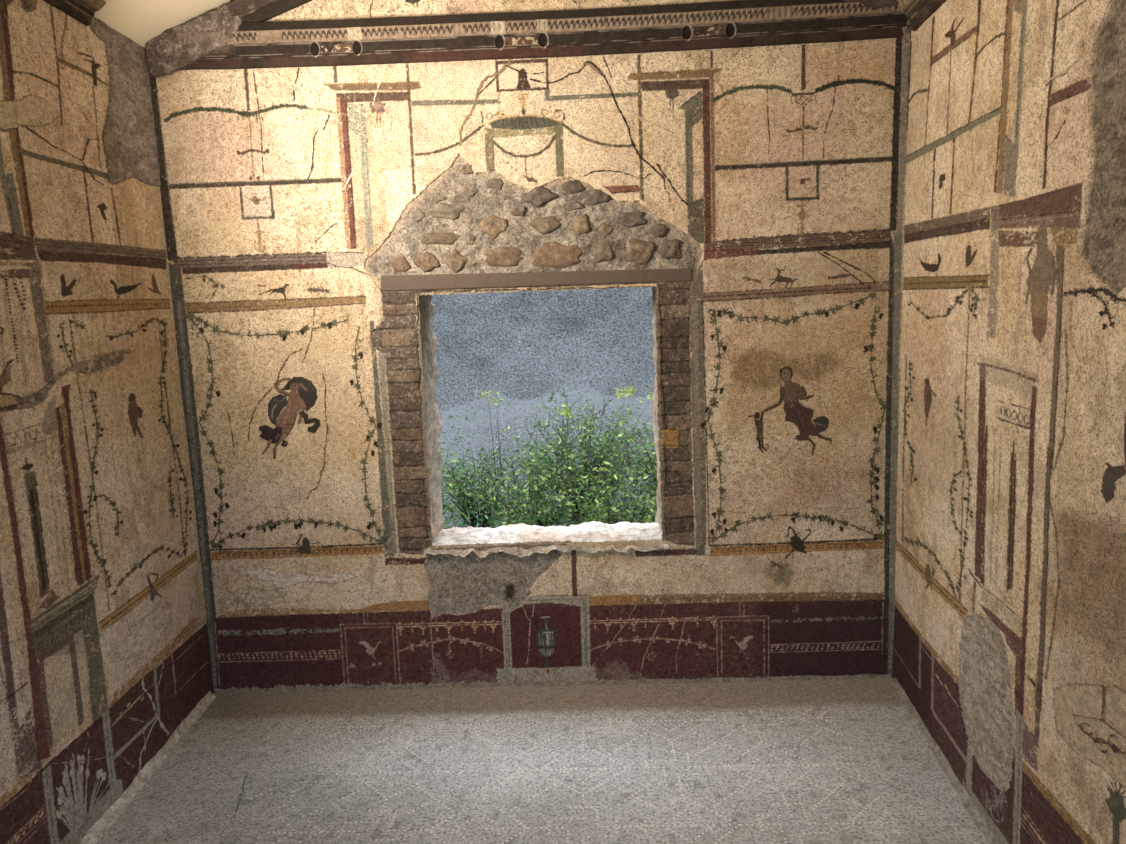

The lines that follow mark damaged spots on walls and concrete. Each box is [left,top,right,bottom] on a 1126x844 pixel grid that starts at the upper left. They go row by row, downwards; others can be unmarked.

flaking render [90,0,243,186]
crack [459,55,688,206]
flaking render [1081,0,1126,294]
flaking render [365,154,703,618]
flaking render [958,614,1014,792]